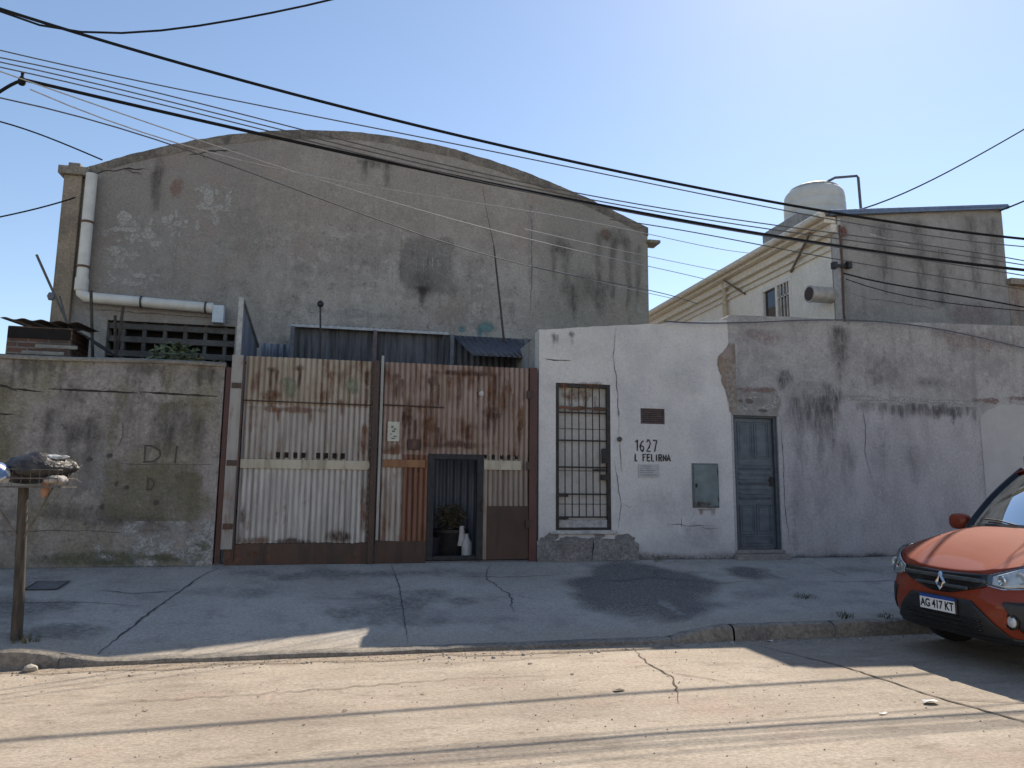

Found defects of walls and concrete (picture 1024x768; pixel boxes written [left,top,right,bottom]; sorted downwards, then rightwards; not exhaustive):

crack [0,384,218,415]
peeling [717,343,781,416]